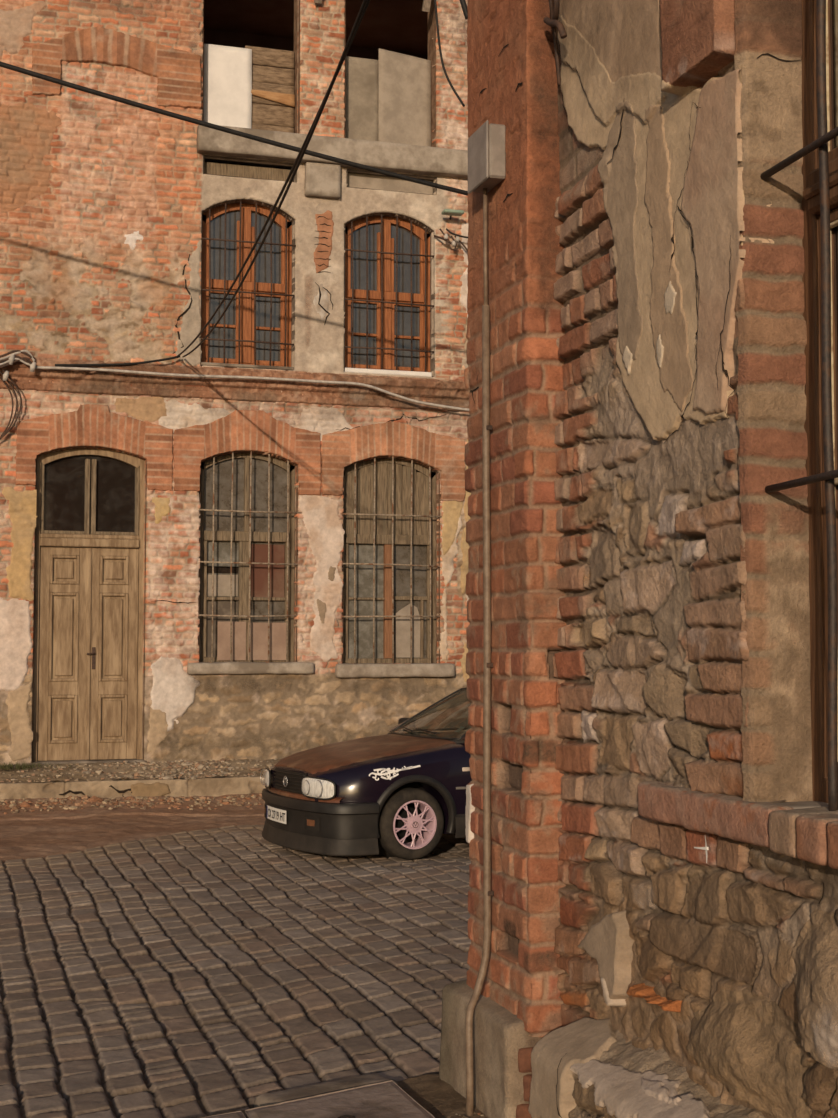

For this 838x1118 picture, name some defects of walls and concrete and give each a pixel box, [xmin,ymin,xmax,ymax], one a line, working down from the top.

peeling [460,223,468,330]
crack [607,109,624,164]
peeling [556,0,774,441]
crack [664,102,735,443]
peeling [0,487,38,761]
peeling [147,656,200,752]
peeling [299,495,345,662]
peeling [436,491,471,682]
spalling [516,910,710,1118]